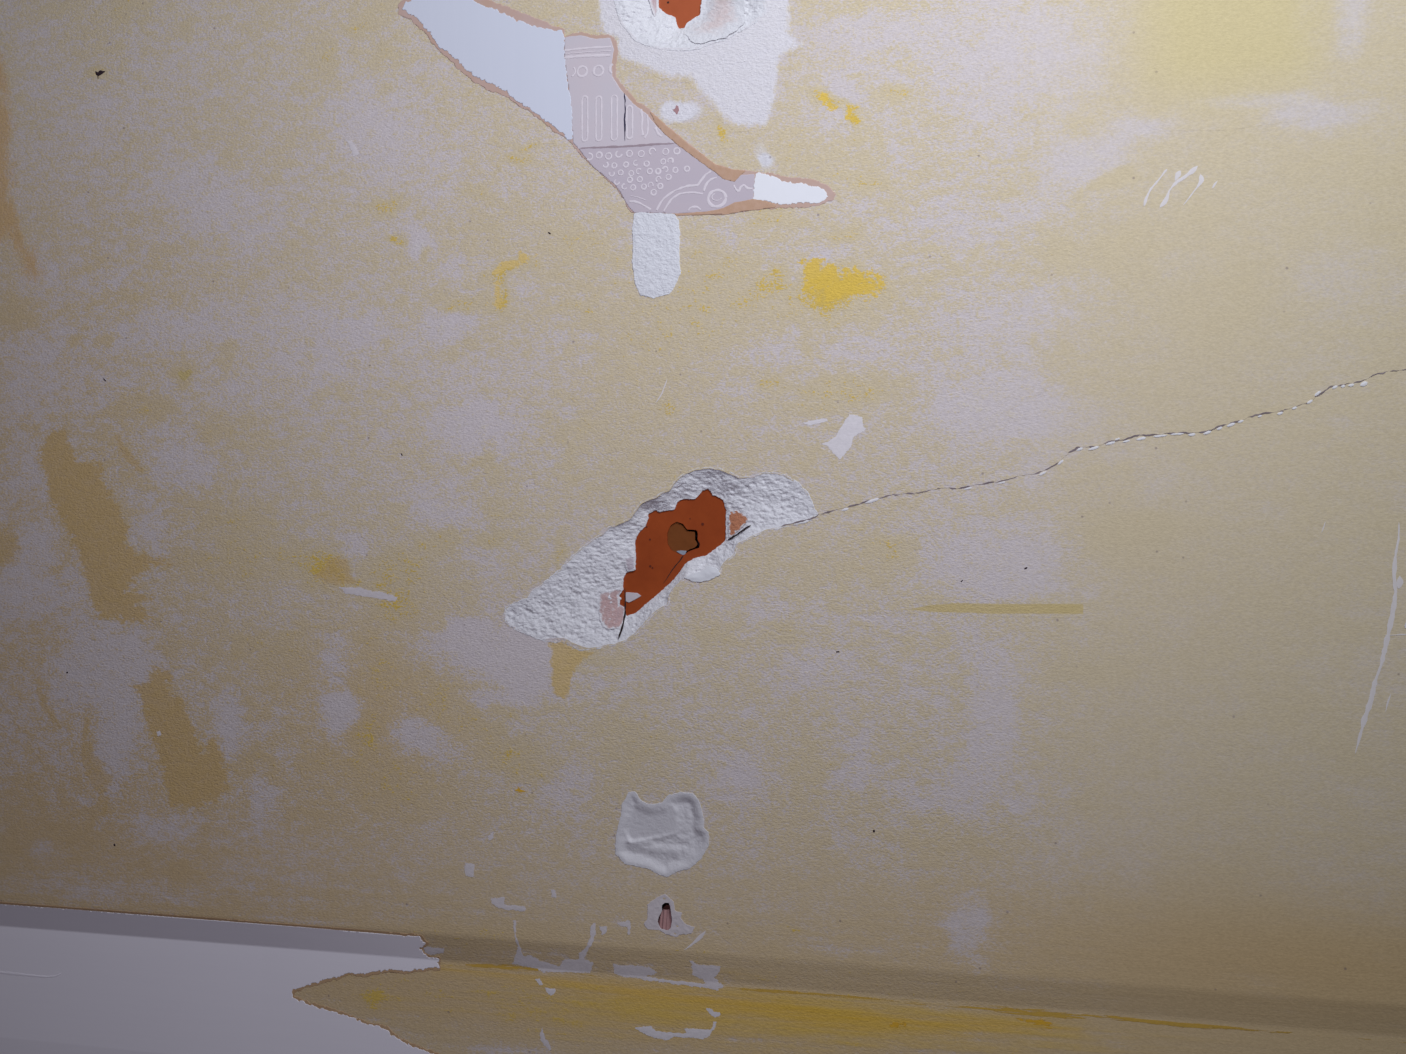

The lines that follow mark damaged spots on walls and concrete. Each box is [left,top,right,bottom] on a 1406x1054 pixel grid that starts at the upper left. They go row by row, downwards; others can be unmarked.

peeling [398,0,836,216]
water stain [786,244,892,311]
peeling [803,414,866,460]
crack [782,369,1406,526]
water stain [34,422,177,631]
flaking render [503,467,818,651]
water stain [129,657,237,814]
flaking render [615,791,709,877]
peeling [0,902,444,1054]
spalling [491,894,695,996]
peeling [613,960,724,991]
peeling [635,1008,721,1040]